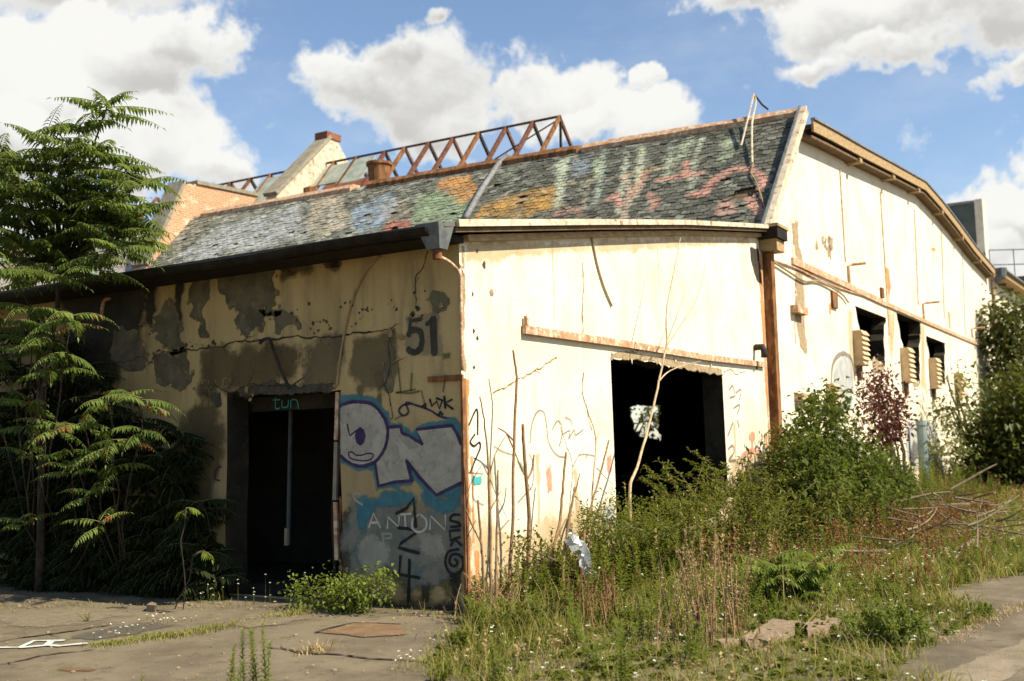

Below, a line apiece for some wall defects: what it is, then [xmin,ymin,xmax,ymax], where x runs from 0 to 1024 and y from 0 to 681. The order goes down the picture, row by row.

corrosion [319,177,369,201]
peeling [110,270,332,392]
crack [109,251,428,406]
corrosion [758,253,772,460]